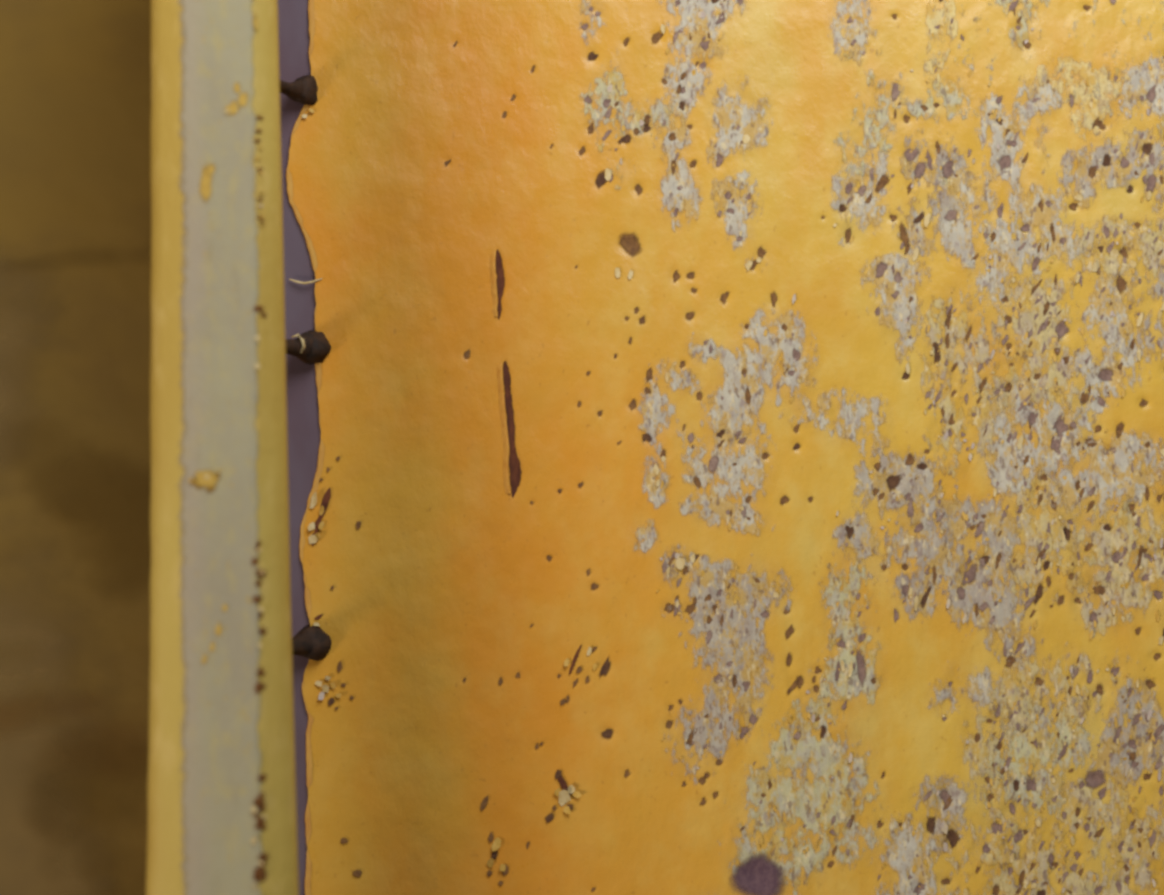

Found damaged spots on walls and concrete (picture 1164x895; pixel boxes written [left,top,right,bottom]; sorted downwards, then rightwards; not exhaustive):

spalling [225,83,248,115]
flaking render [278,0,316,339]
peeling [579,0,773,249]
crack [490,249,505,319]
flaking render [286,354,340,638]
crack [497,361,522,497]
spalling [557,645,610,705]
flaking render [292,655,354,895]
spalling [545,770,581,823]